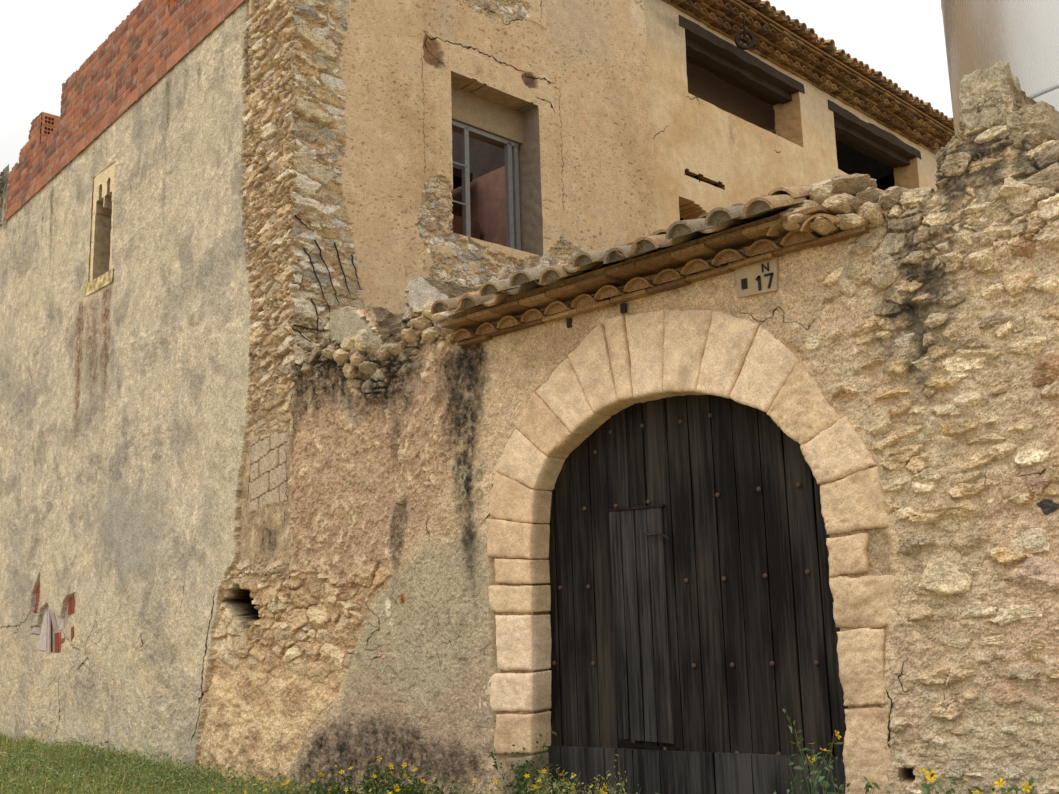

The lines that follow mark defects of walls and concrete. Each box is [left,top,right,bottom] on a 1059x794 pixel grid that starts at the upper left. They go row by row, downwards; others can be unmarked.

crack [421,29,564,214]
spalling [241,0,583,425]
corrosion [76,288,110,410]
crack [743,303,815,330]
water stain [893,229,932,352]
water stain [444,343,485,544]
spalling [29,568,77,658]
crack [191,593,215,741]
spalling [196,562,390,787]
crack [884,660,912,753]